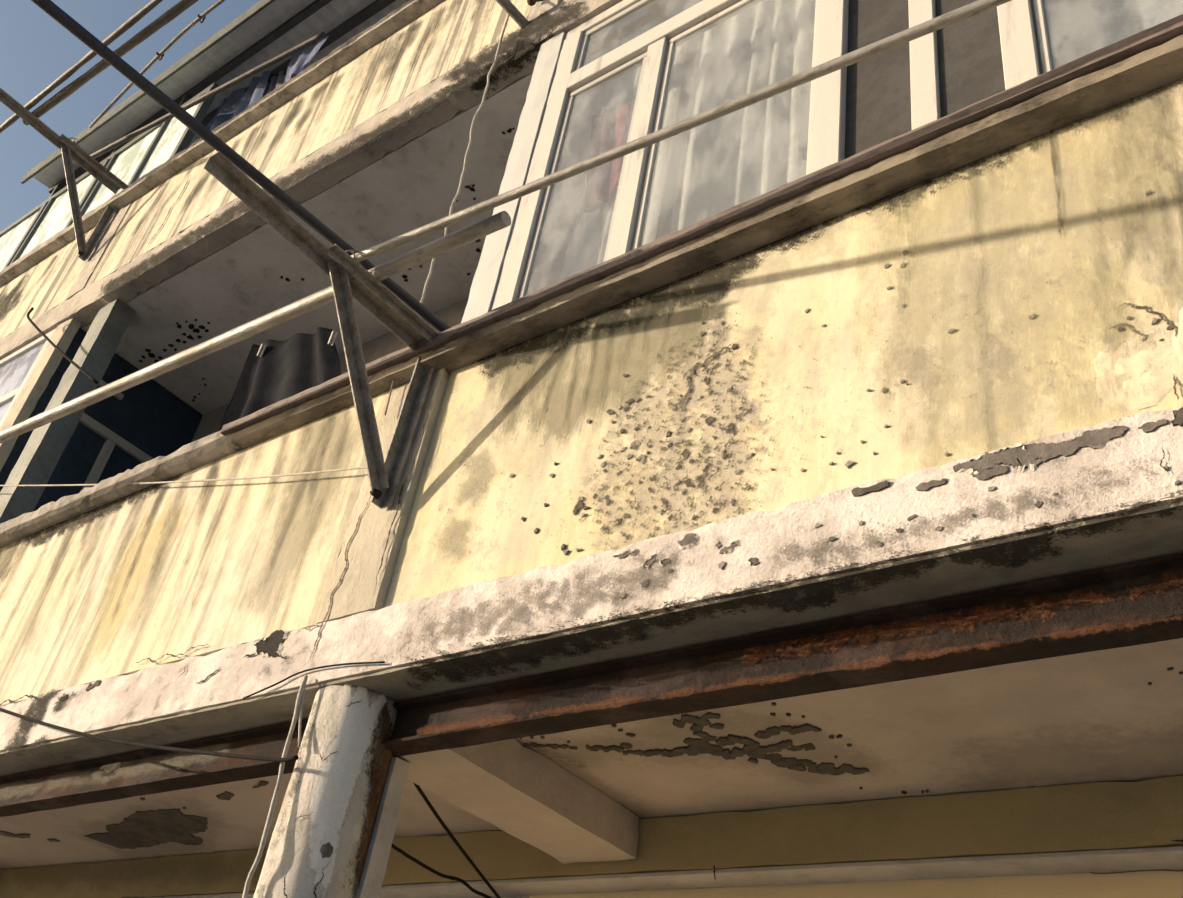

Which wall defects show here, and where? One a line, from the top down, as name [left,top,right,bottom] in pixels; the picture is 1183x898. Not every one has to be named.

damp [263,0,588,197]
damp [100,200,250,302]
damp [472,78,1183,555]
crack [1172,373,1180,399]
peeling [915,407,1183,492]
damp [10,474,189,584]
crack [304,375,441,659]
spalling [244,629,289,658]
rust [417,571,1183,735]
rust [356,703,393,887]
peeling [520,702,869,790]
crack [283,863,329,898]